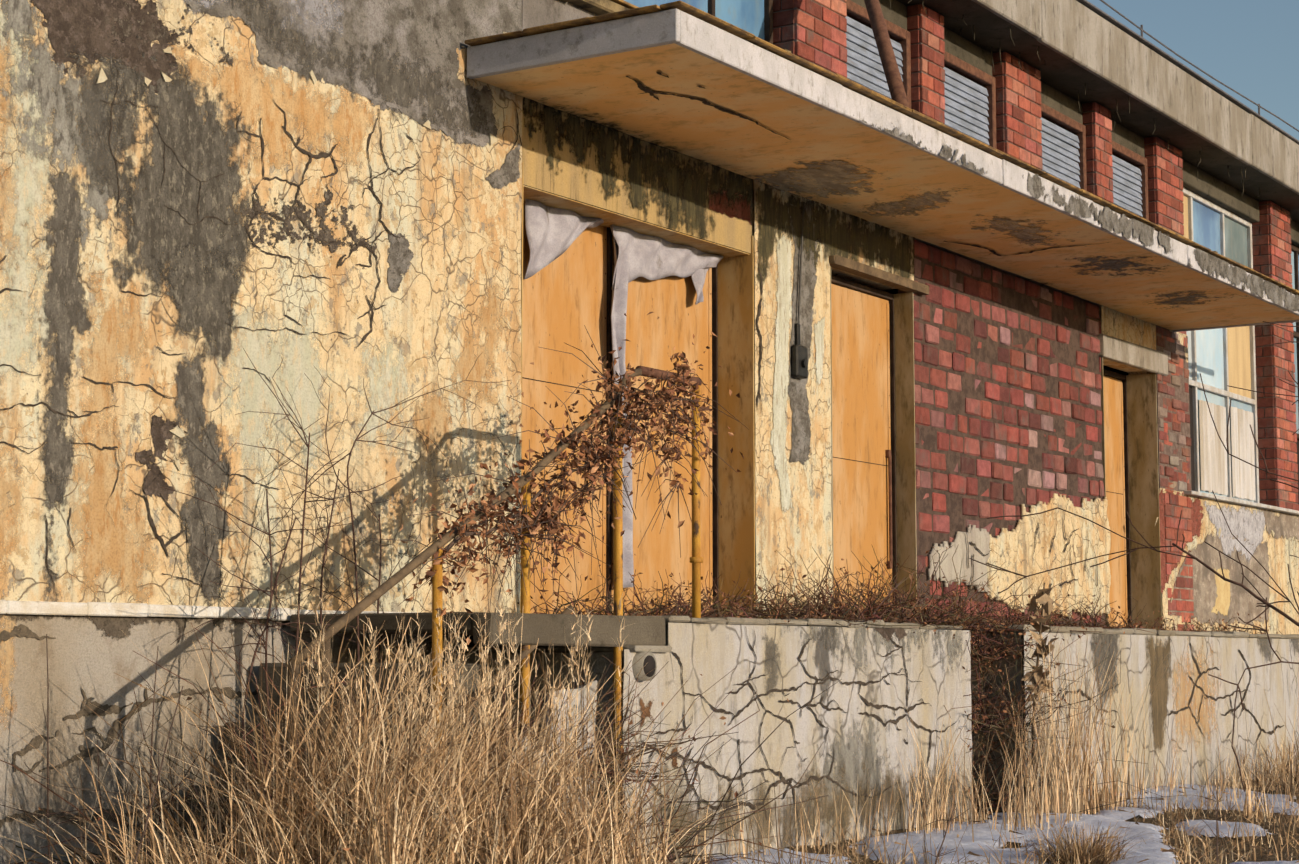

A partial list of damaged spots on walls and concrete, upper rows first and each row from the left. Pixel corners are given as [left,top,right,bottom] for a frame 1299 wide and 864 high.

peeling [30,0,523,147]
crack [626,71,790,140]
water stain [0,0,332,643]
crack [100,61,420,347]
flaking render [242,185,414,293]
water stain [522,98,915,513]
crack [0,364,213,597]
peeling [927,493,1111,620]
peeling [1155,488,1299,627]
crack [639,626,956,822]
water stain [765,626,963,703]
water stain [1146,636,1172,753]